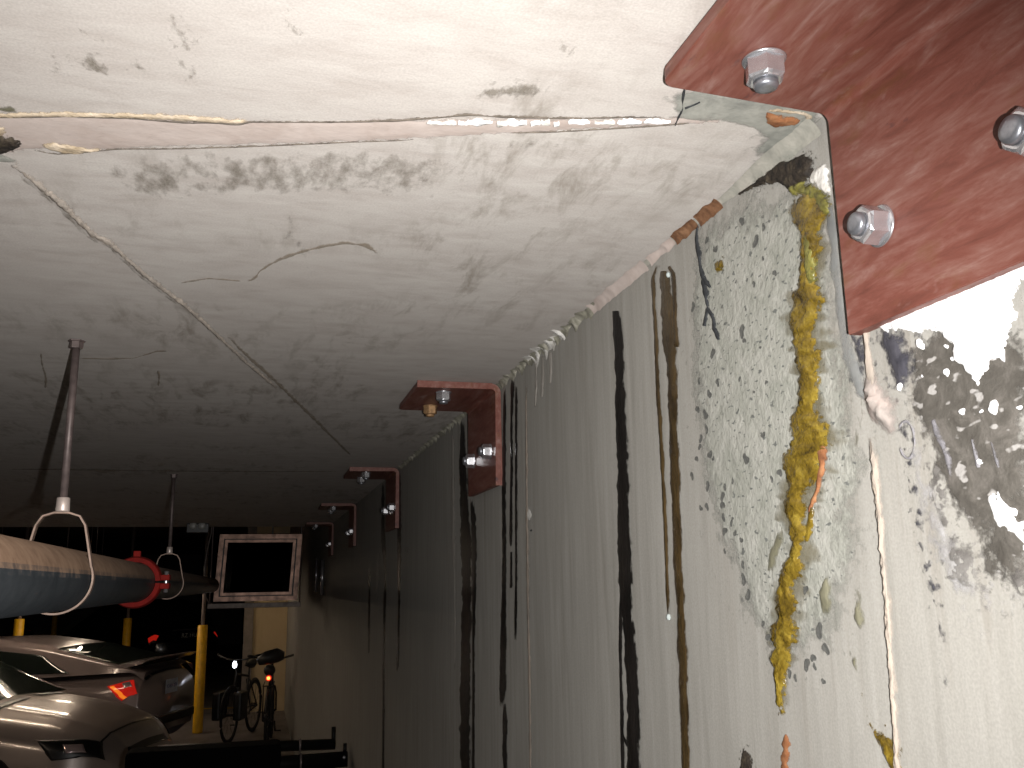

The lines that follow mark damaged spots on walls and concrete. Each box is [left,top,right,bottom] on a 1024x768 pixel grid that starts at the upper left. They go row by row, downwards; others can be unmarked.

crack [0,90,700,155]
spalling [738,153,830,195]
rust [645,199,723,266]
crack [695,226,720,340]
peeling [880,266,1024,385]
hole [690,406,714,480]
peeling [979,400,998,415]
water stain [451,421,477,768]
water stain [499,380,532,768]
water stain [612,311,641,768]
hole [699,479,743,543]
peeling [988,492,1024,550]